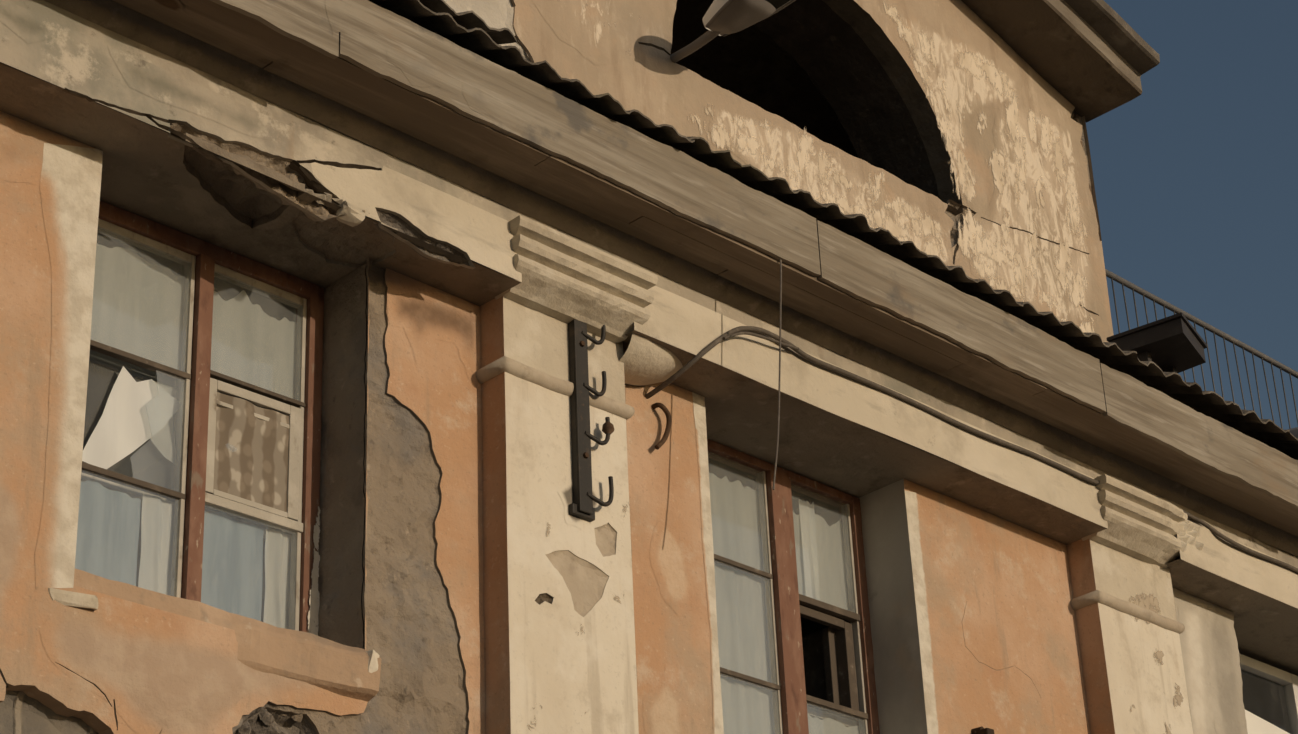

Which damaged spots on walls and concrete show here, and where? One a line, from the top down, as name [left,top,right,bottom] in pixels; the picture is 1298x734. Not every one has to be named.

peeling [444,0,531,61]
peeling [532,0,647,65]
peeling [688,1,1102,333]
crack [981,217,1089,254]
spalling [167,119,476,734]
spalling [535,593,554,605]
spalling [545,522,621,635]
spalling [0,683,114,734]
crack [55,662,118,730]